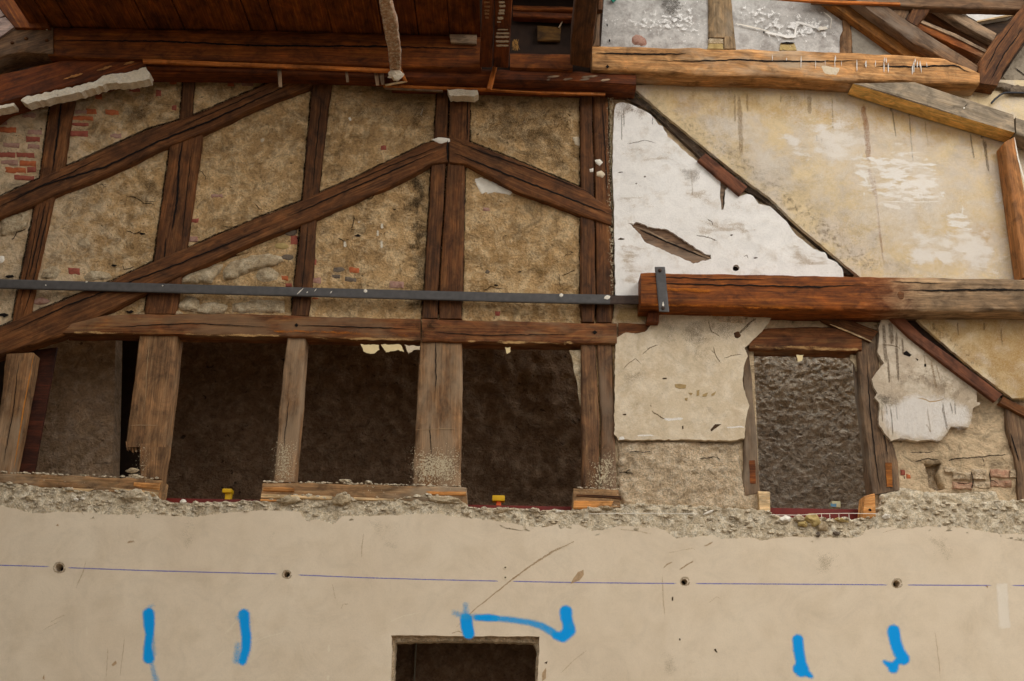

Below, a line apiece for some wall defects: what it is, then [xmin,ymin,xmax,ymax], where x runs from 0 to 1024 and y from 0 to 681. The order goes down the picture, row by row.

water stain [610,84,1002,278]
spalling [631,223,711,264]
spalling [0,483,1024,542]